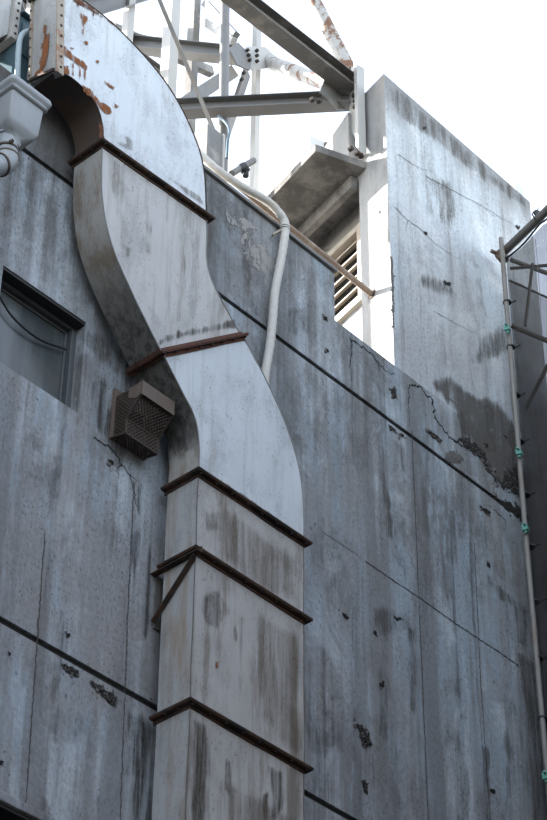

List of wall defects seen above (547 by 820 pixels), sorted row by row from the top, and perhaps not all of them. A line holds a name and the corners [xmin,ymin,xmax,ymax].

rust [35,25,49,75]
rust [74,0,114,45]
rust [64,46,118,114]
damp [397,92,445,136]
damp [97,383,111,442]
spalling [445,437,528,522]
crack [322,337,519,820]
crack [94,437,139,820]
spalling [61,663,79,678]
spalling [90,680,117,706]
damp [519,655,547,820]